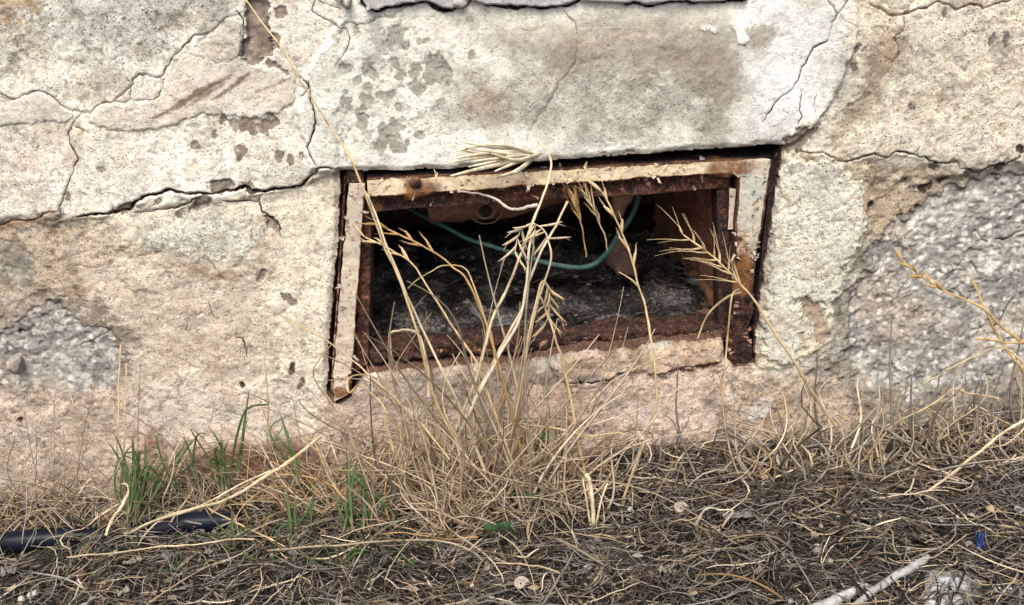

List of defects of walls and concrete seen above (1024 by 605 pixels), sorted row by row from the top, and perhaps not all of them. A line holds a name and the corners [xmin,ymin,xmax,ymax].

spalling [240,0,289,76]
crack [762,0,1010,125]
crack [0,0,342,238]
rust [406,179,437,197]
rust [708,159,753,175]
crack [802,147,1023,174]
spalling [0,238,36,288]
rust [733,254,752,298]
spalling [724,124,1024,403]
spalling [0,295,129,404]
rust [538,367,559,388]
rust [669,362,720,374]